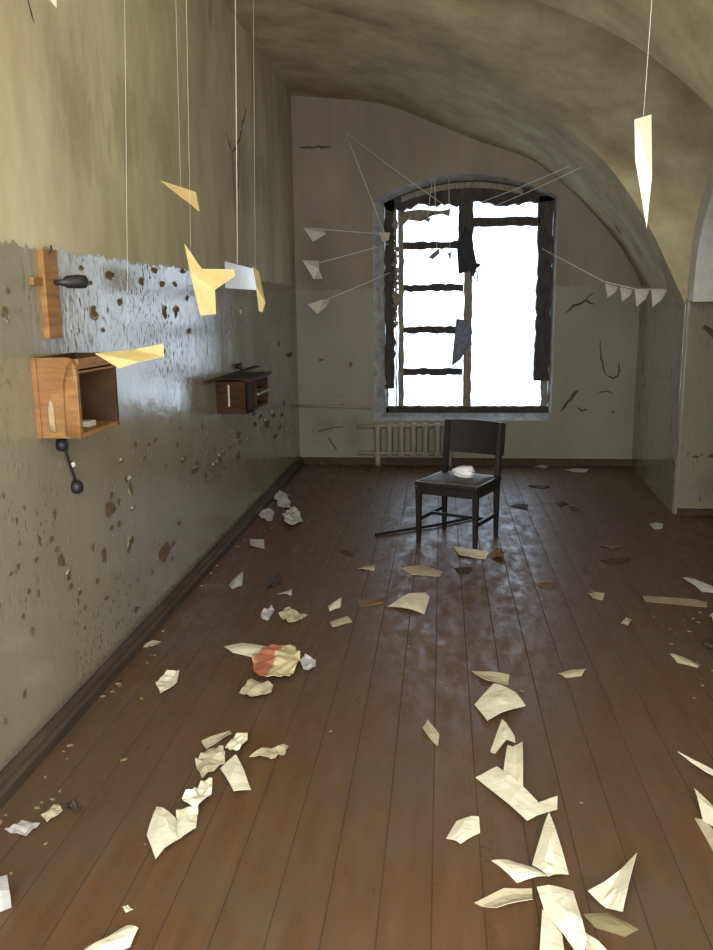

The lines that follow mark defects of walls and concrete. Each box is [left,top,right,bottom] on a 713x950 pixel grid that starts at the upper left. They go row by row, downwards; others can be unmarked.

peeling [139,267,185,287]
peeling [163,295,189,319]